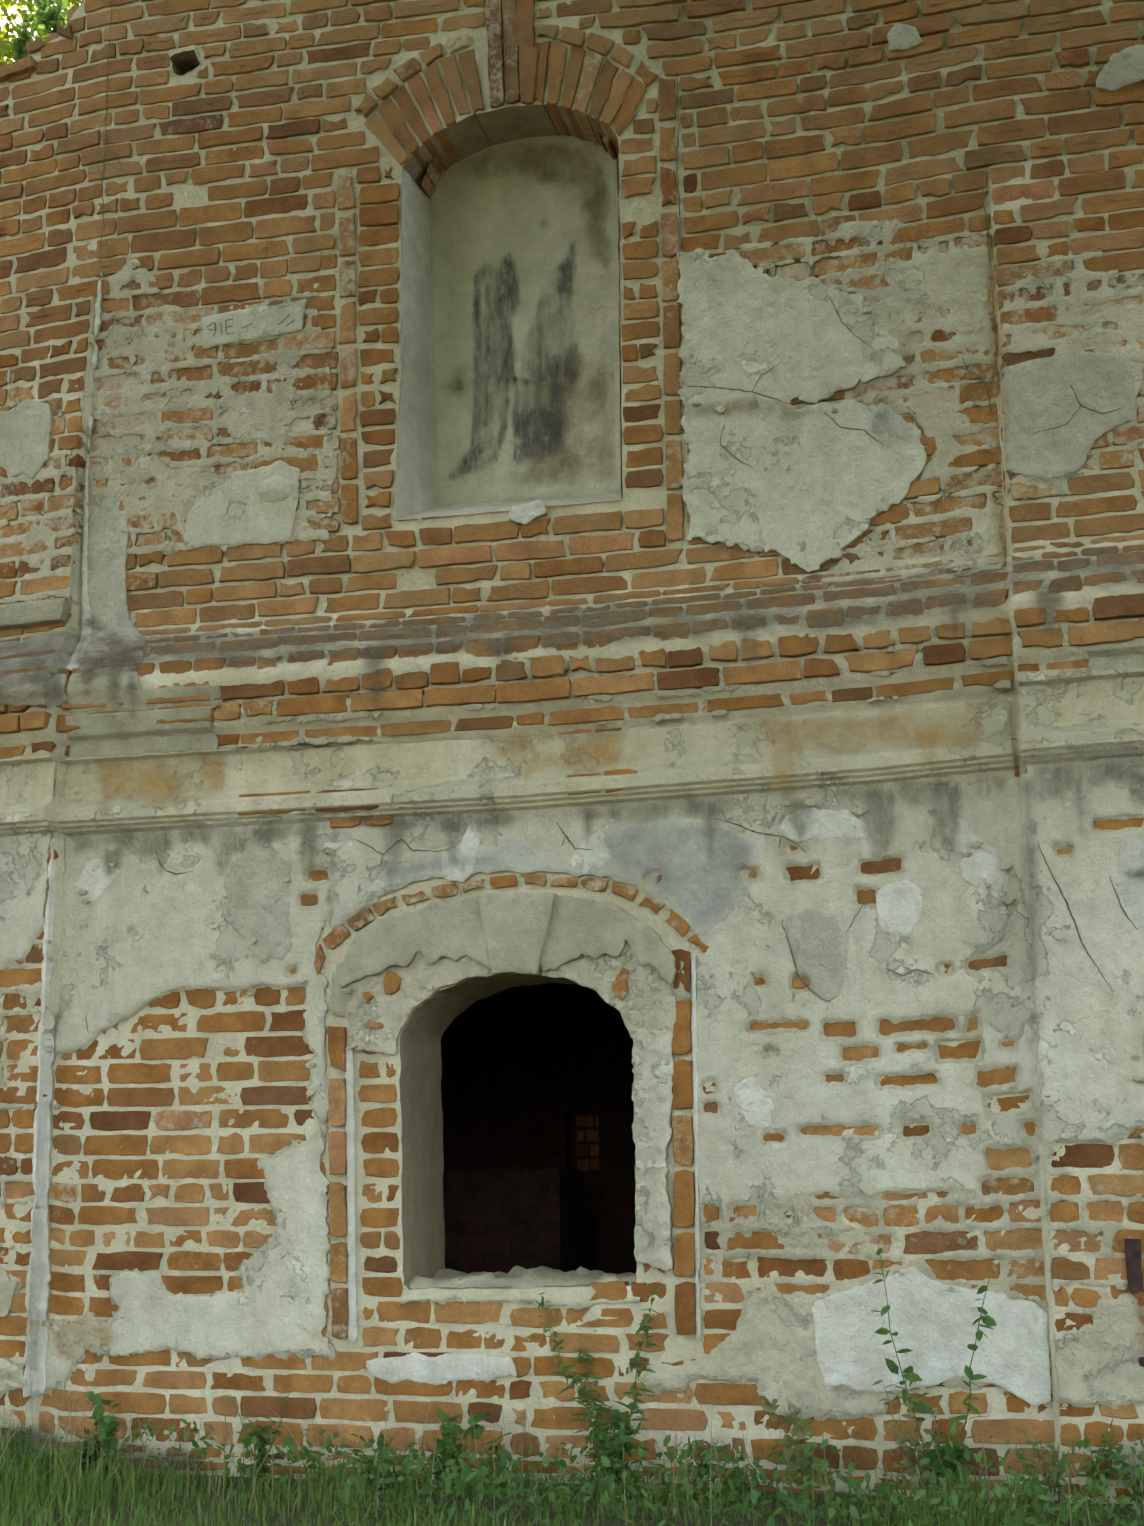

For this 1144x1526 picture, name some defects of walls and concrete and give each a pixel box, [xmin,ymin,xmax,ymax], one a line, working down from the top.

crack [829,296,872,348]
crack [687,363,885,468]
damp [0,568,993,699]
spalling [1089,814,1144,833]
flaking render [342,952,497,1055]
flaking render [541,941,677,1038]
spalling [787,973,812,994]
spalling [935,951,1013,977]
crack [1037,842,1113,992]
crack [1110,876,1138,930]
spalling [0,917,328,1335]
flaking render [0,1011,1144,1504]